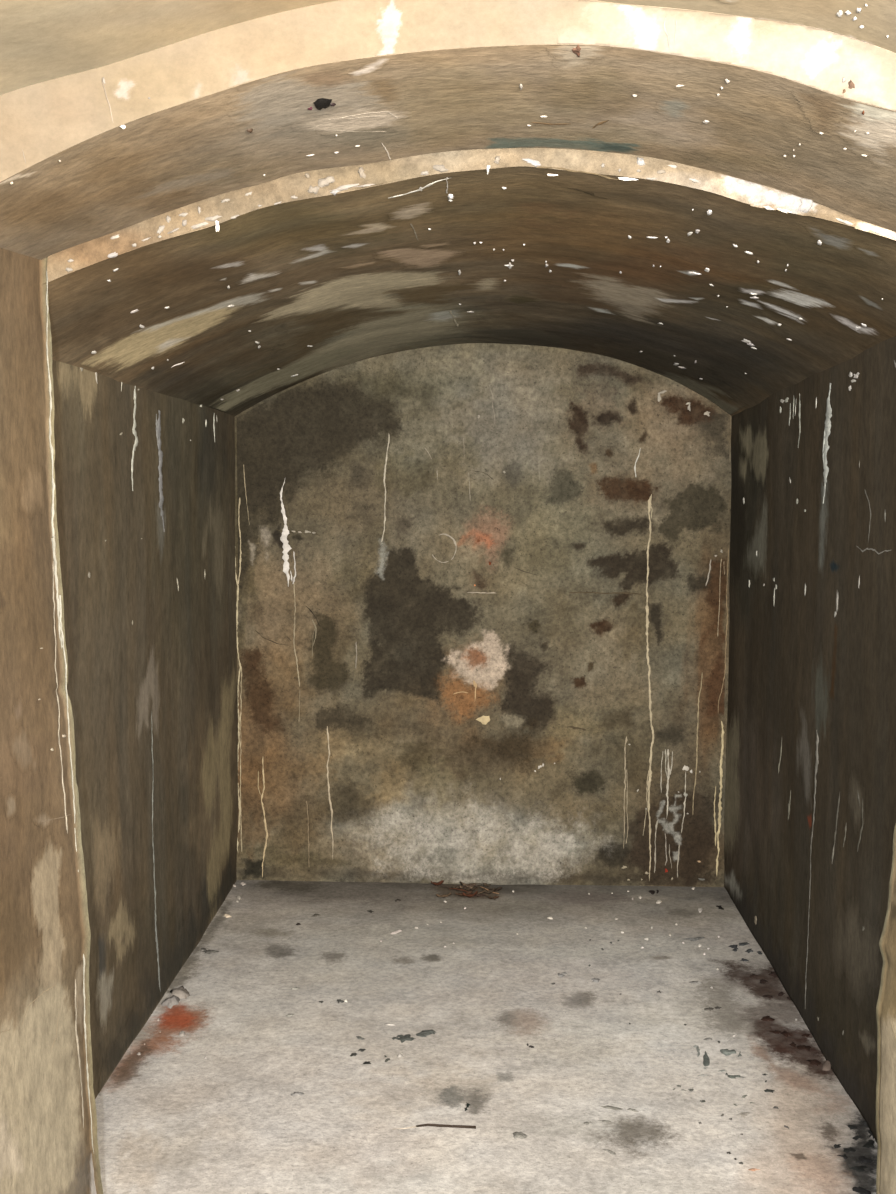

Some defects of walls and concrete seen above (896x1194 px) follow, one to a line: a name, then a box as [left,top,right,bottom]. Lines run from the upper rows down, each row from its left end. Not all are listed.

corrosion [433,643,552,779]
leakage [70,366,876,1194]
corrosion [126,999,219,1059]